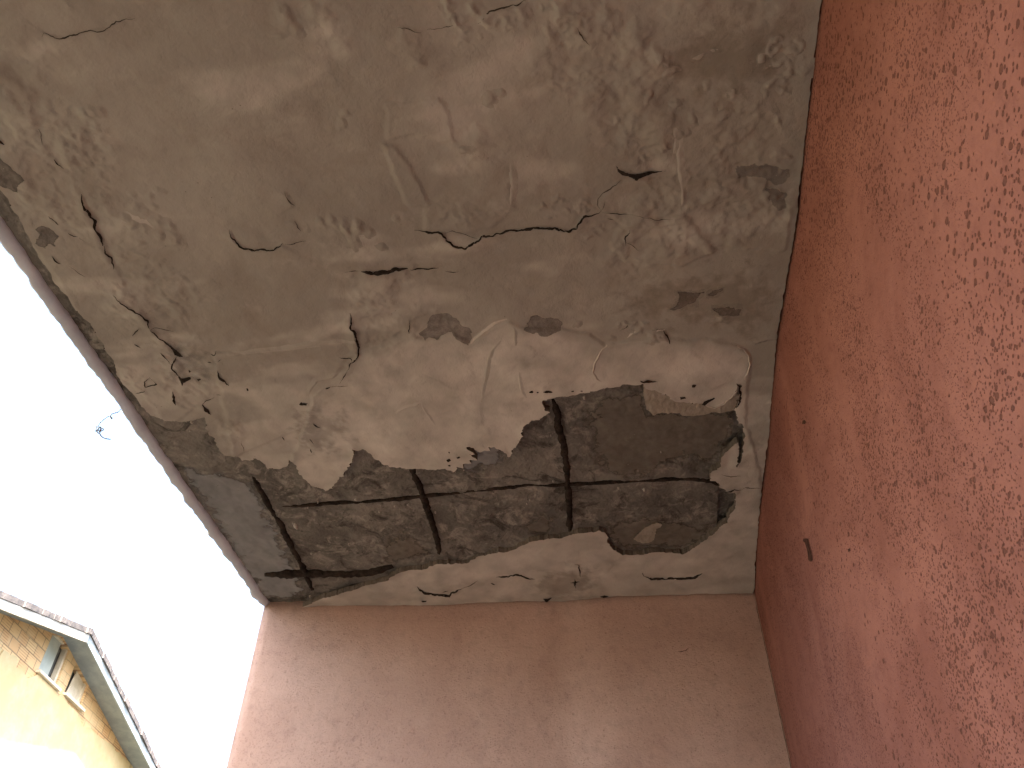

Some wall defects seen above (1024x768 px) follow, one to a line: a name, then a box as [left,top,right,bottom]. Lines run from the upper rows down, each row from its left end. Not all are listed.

crack [42,19,132,39]
crack [49,194,114,269]
crack [229,195,303,252]
crack [349,181,667,276]
crack [333,314,360,387]
spalling [0,159,740,602]
crack [417,574,535,598]
crack [642,572,701,580]